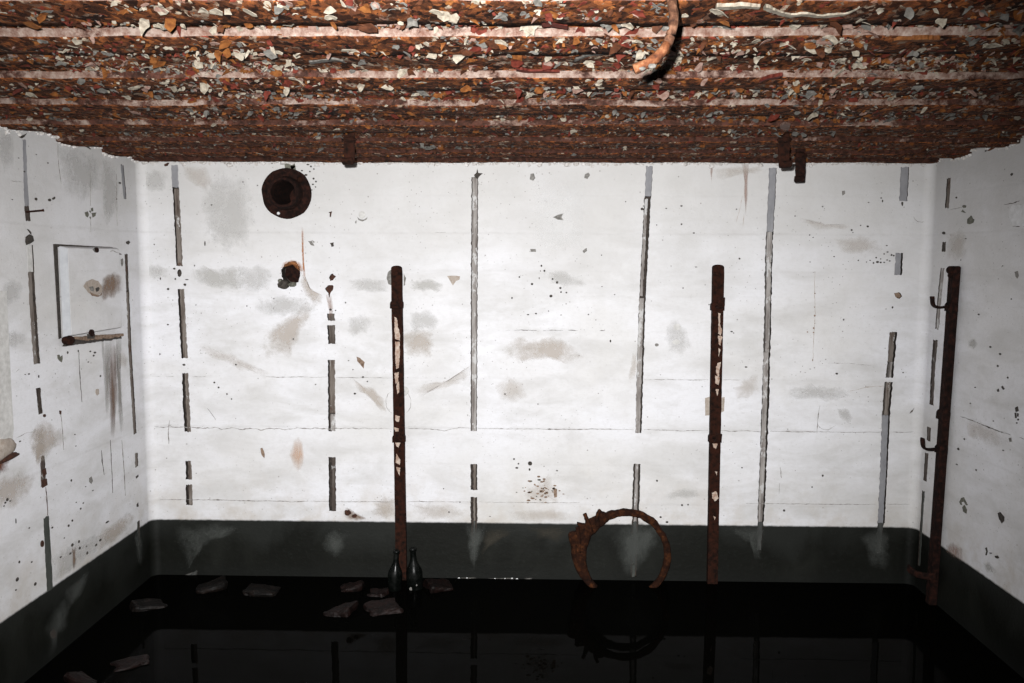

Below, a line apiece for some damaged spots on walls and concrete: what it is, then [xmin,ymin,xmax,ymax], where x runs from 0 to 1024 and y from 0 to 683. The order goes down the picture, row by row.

peeling [0,0,1024,190]